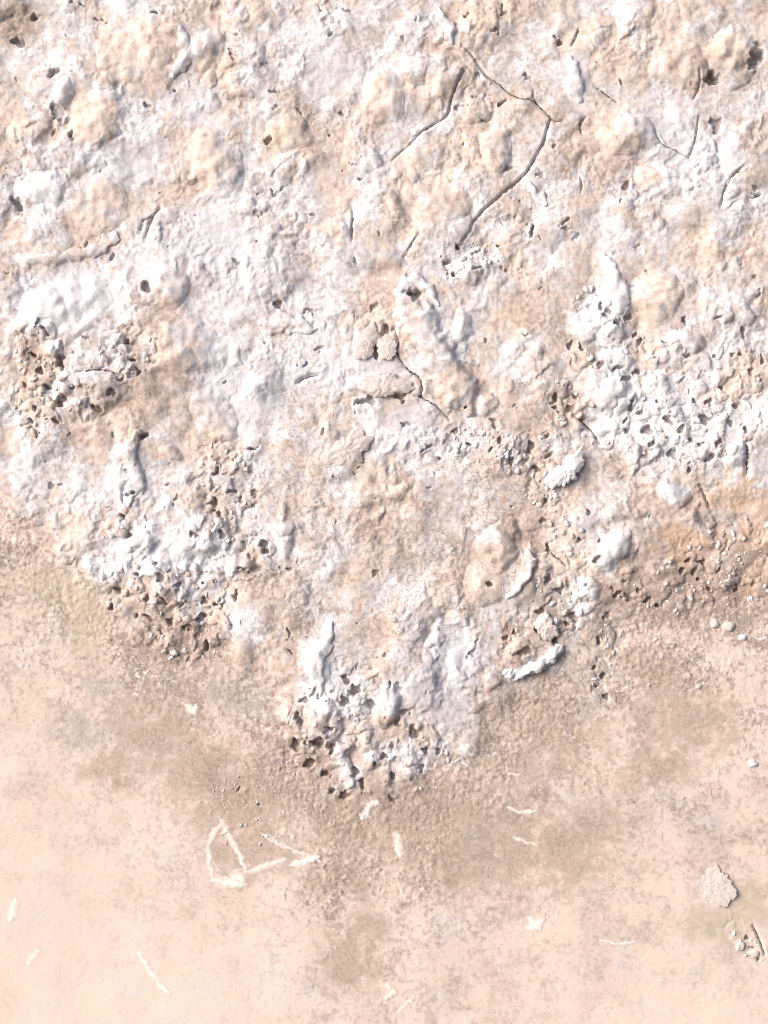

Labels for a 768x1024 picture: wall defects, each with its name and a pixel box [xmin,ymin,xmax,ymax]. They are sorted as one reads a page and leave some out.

leakage [263,22,385,99]
crack [398,46,586,237]
leakage [546,36,606,128]
crack [655,70,700,157]
leakage [631,95,756,195]
leakage [10,59,412,449]
crack [394,330,449,420]
leakage [374,397,487,468]
leakage [0,482,768,1020]